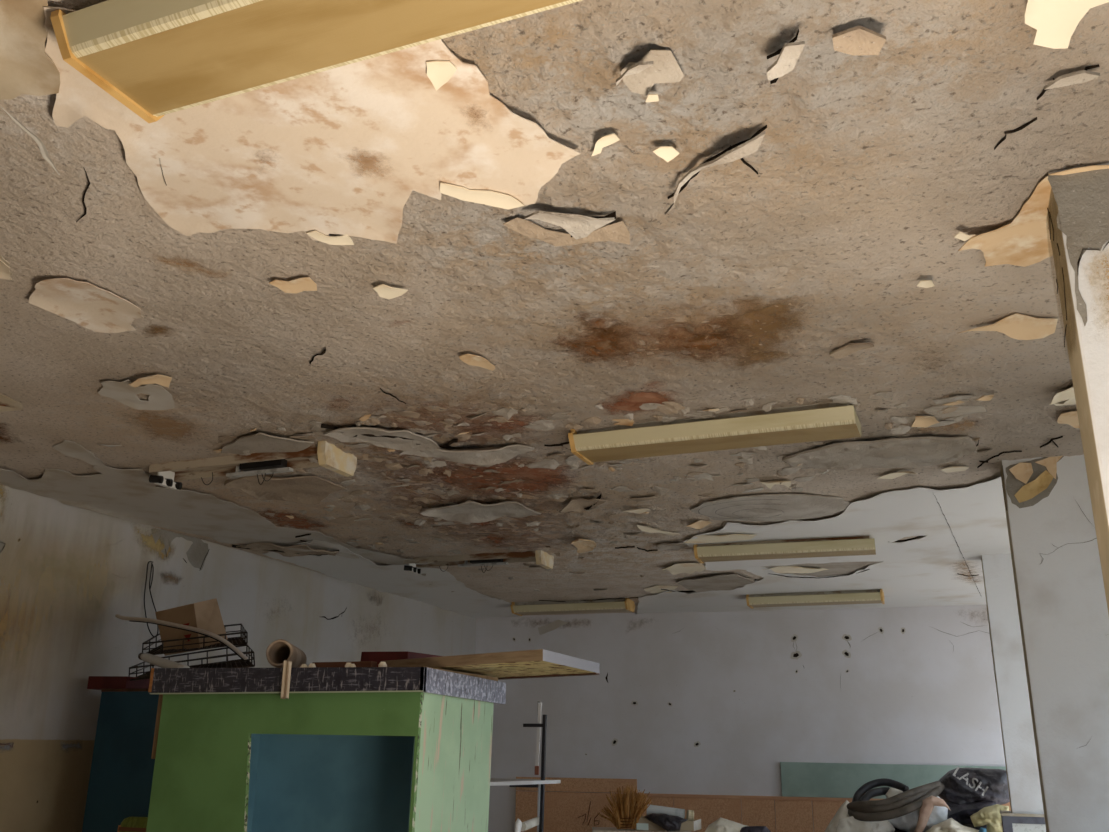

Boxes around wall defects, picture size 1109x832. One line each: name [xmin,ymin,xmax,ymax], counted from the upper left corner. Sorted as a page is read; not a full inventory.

crack [0,105,90,222]
peeling [0,0,630,246]
flaking render [616,49,684,102]
crack [668,125,767,199]
crack [767,28,799,84]
flaking render [767,41,805,80]
crack [994,78,1055,150]
peeling [1025,0,1109,49]
flaking render [954,164,1109,326]
peeling [0,464,520,618]
rust [383,448,574,548]
peeling [622,456,1064,615]